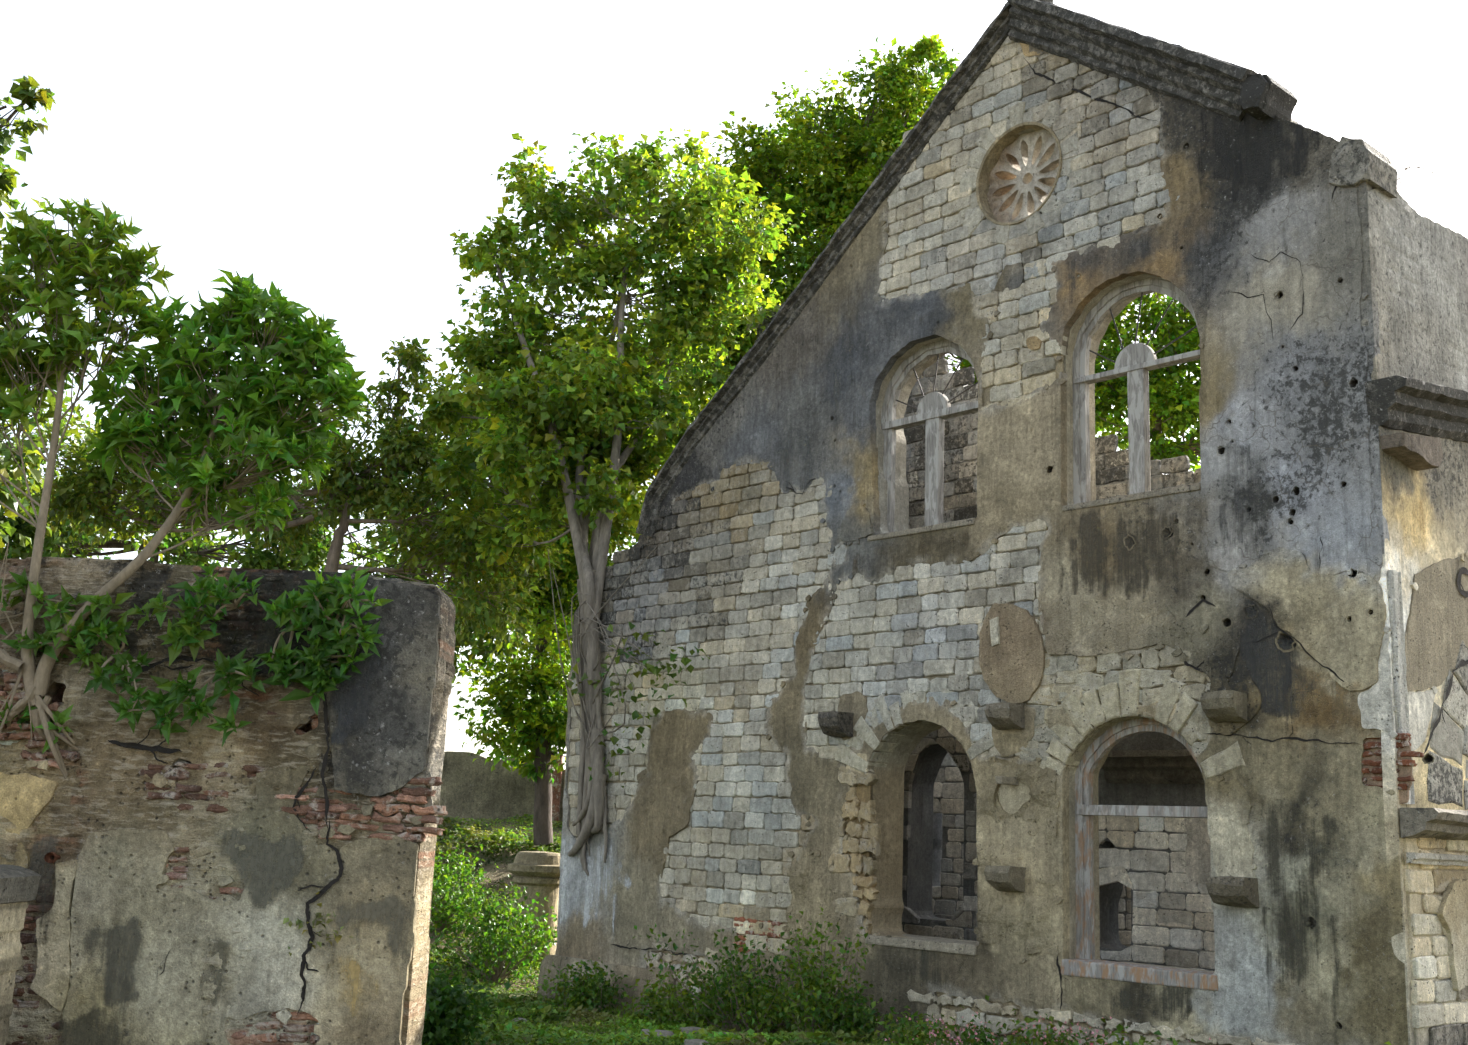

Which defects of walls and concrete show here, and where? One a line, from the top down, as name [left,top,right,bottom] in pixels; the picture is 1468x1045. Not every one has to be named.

flaking render [877,37,1180,411]
water stain [1198,115,1319,201]
water stain [1060,507,1178,602]
peeling [1198,182,1468,804]
crack [1252,603,1352,687]
crack [292,614,344,1017]
flaking render [266,710,448,842]
flaking render [564,459,1261,1002]
flaking render [6,887,64,1045]
flaking render [230,1008,331,1045]